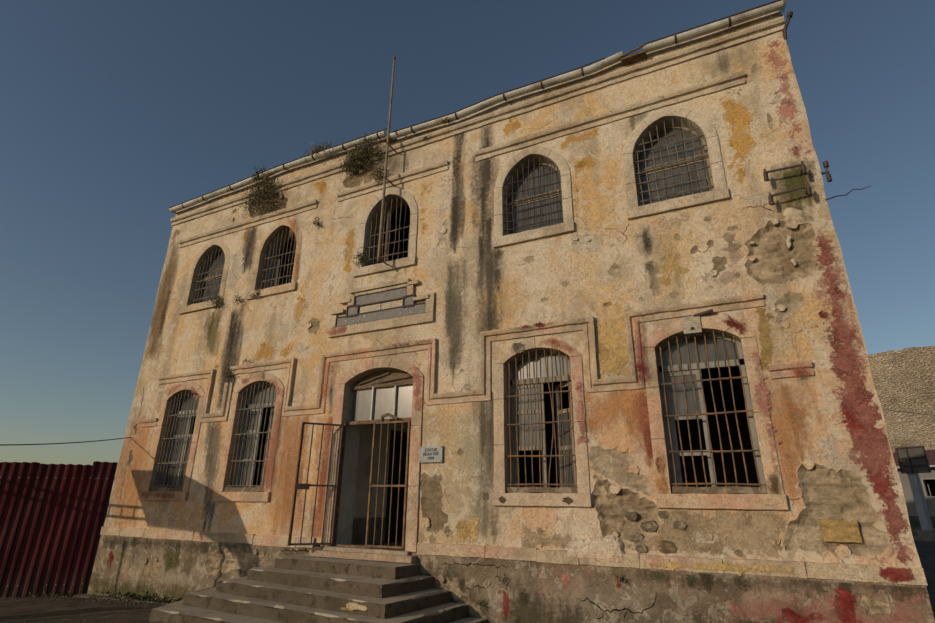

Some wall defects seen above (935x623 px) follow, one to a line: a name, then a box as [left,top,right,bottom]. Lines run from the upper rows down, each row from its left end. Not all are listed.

peeling [572,154,594,201]
water stain [449,134,502,331]
water stain [208,308,243,407]
water stain [446,265,465,372]
flaking render [572,216,915,623]
flaking render [417,471,480,543]
crack [577,593,657,619]